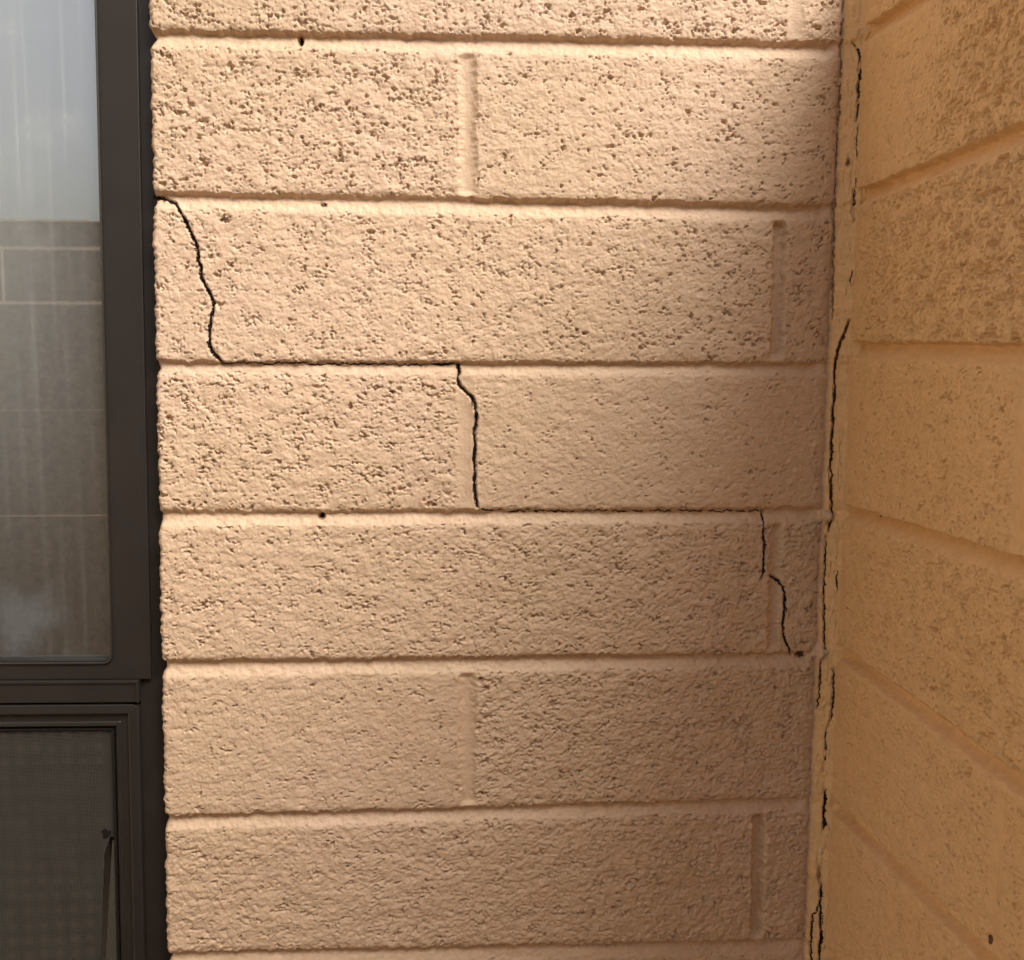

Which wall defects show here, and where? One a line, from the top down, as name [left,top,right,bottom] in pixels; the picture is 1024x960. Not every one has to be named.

crack [153,196,791,653]
crack [816,0,862,760]
crack [810,883,824,960]
crack [821,789,829,830]